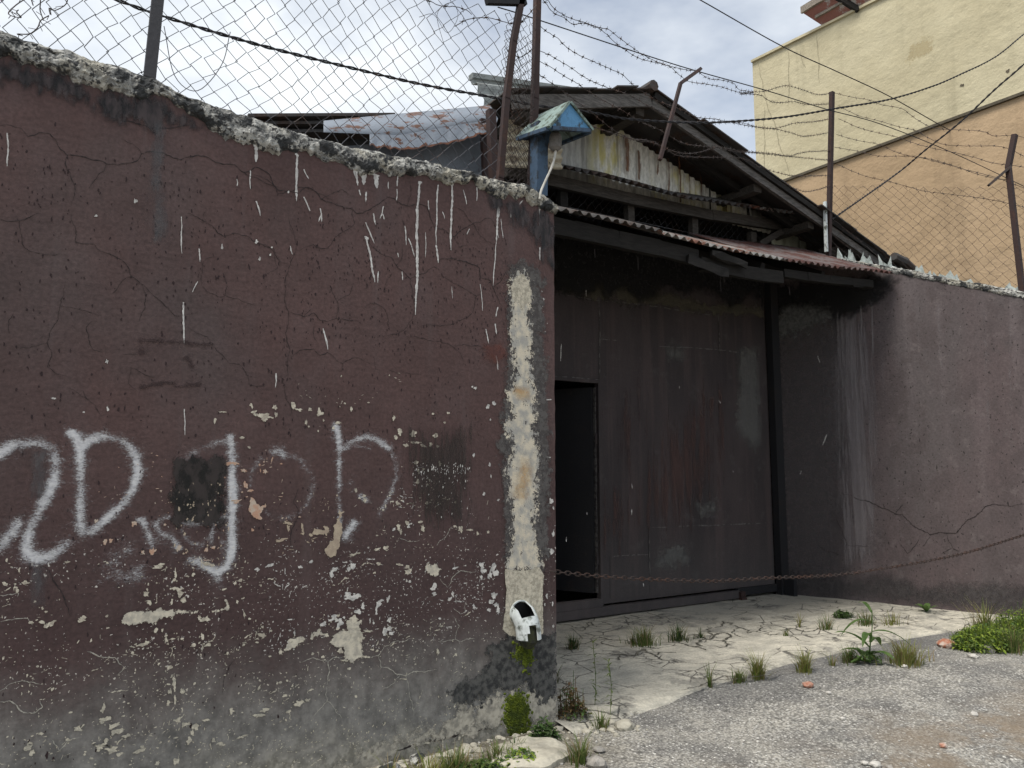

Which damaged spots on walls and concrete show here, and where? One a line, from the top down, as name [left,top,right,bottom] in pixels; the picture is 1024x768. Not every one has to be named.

crack [1,116,514,416]
flaking render [0,258,555,768]
damp [779,313,1024,609]
crack [844,494,1018,555]
damp [332,632,557,768]